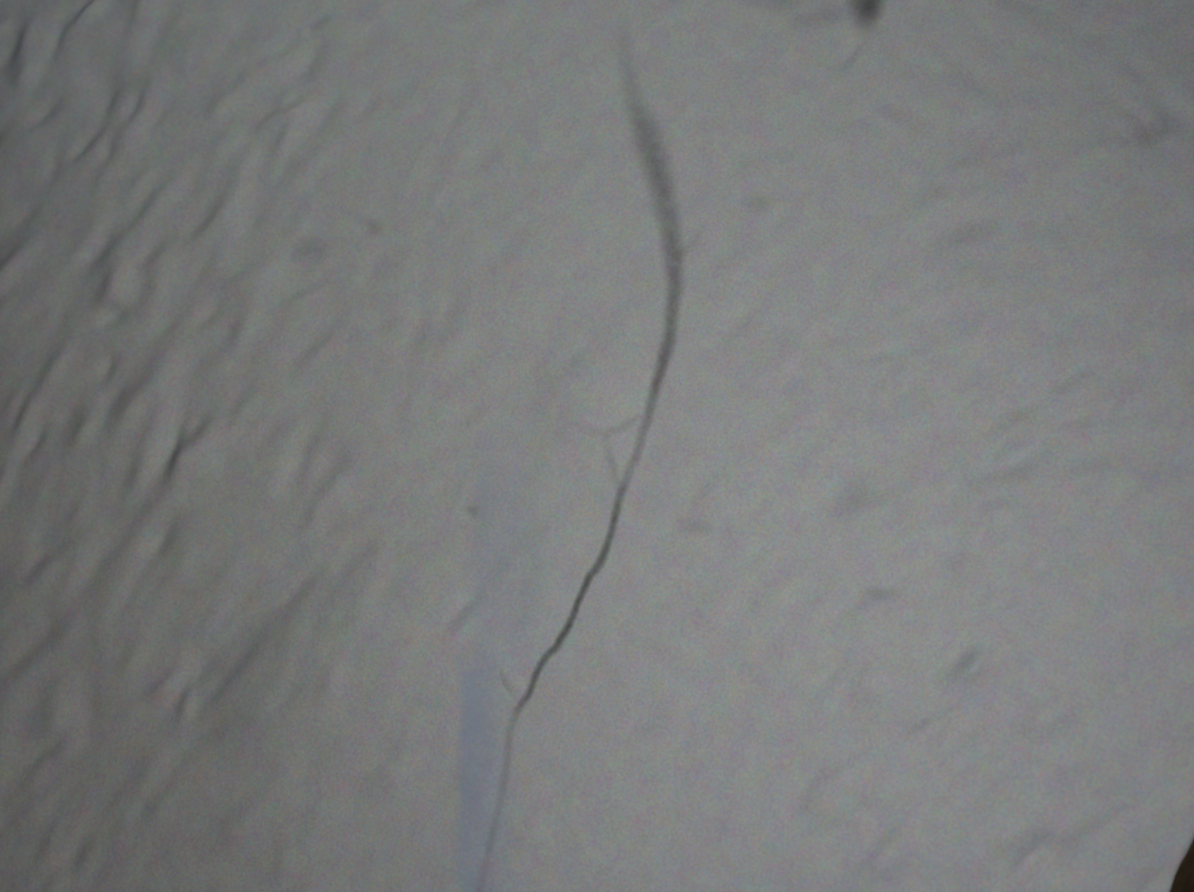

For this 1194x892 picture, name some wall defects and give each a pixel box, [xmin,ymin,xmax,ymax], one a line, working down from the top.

crack [643,69,696,183]